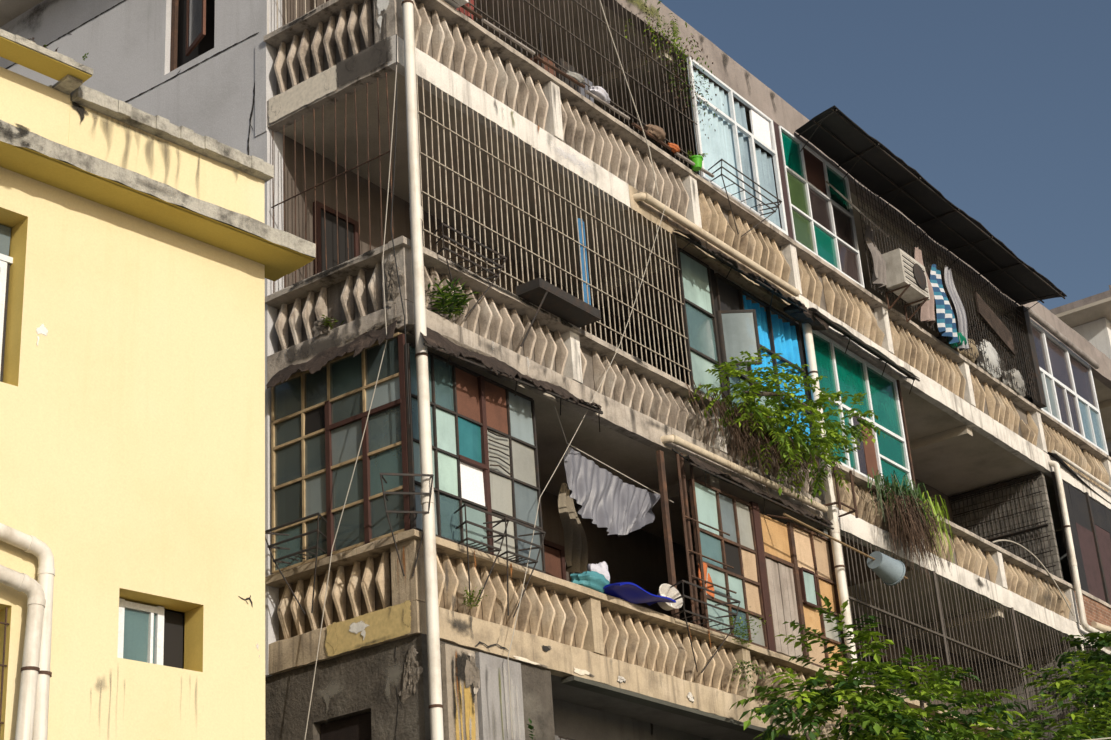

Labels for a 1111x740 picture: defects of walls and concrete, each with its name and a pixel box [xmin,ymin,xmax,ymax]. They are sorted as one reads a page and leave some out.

mould [0,122,43,148]
damp [72,102,108,129]
crack [247,82,255,155]
peeling [325,600,423,703]
damp [452,652,475,723]